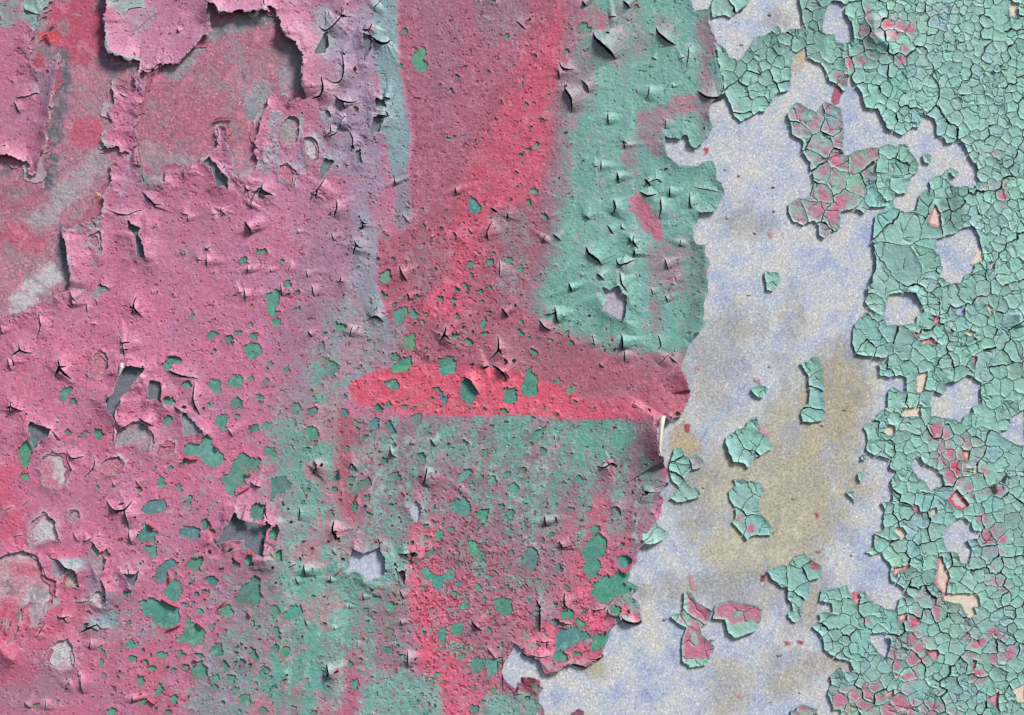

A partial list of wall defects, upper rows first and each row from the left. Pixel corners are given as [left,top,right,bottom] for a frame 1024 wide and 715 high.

peeling [0,437,113,677]
peeling [0,0,324,327]
peeling [64,301,305,715]
peeling [422,0,982,715]
crack [698,91,724,101]
crack [800,0,1024,715]